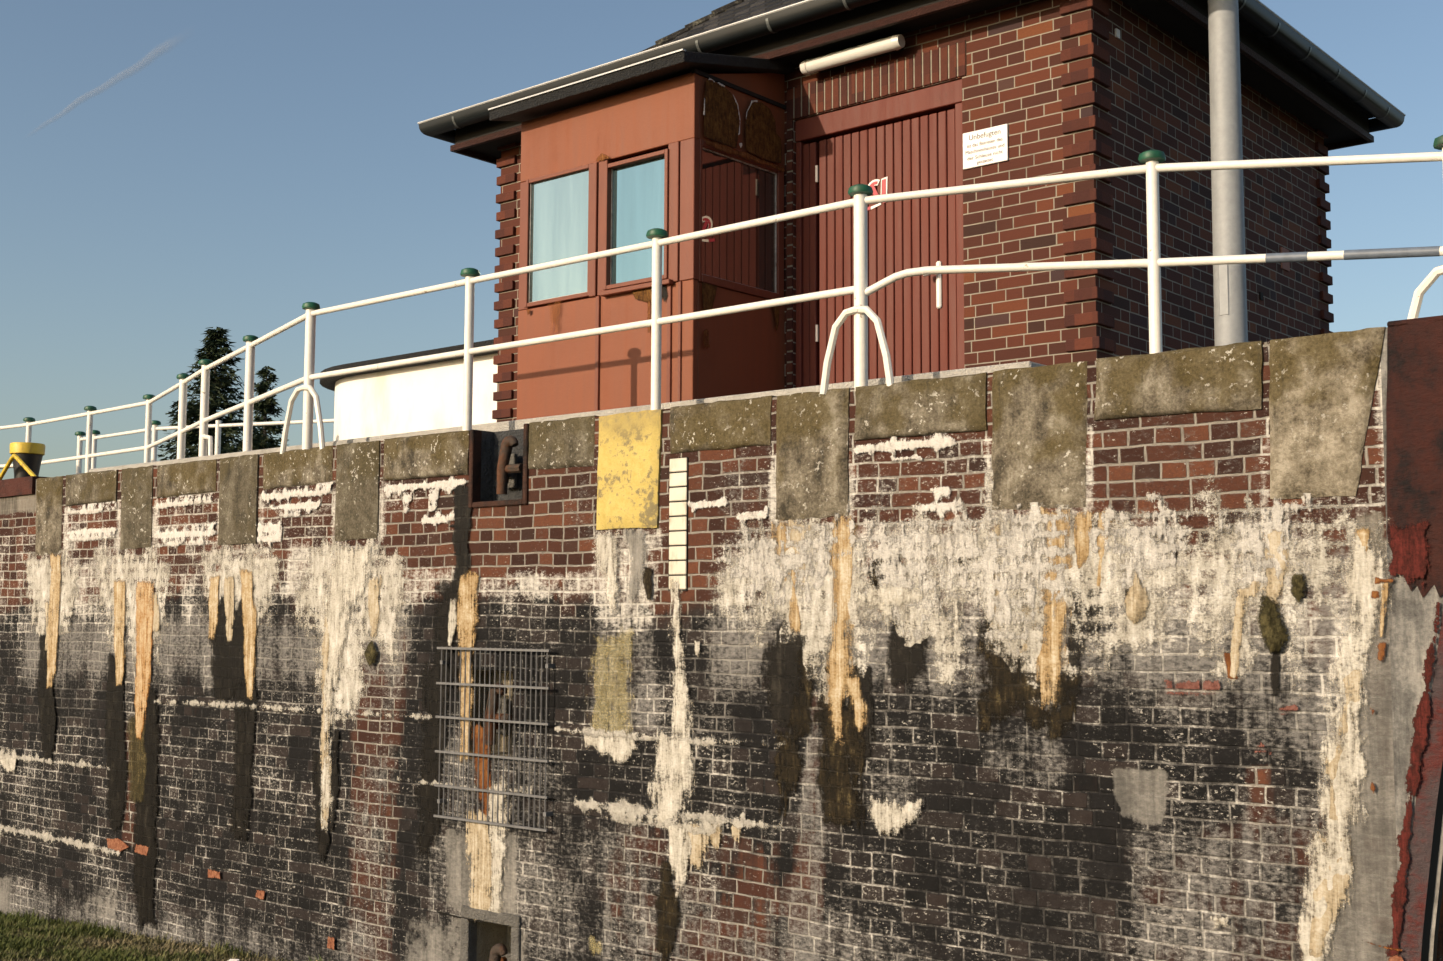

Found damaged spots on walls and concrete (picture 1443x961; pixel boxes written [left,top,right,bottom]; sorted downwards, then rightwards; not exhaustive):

leakage [0,758,16,773]
leakage [37,634,56,765]
leakage [105,651,160,931]
leakage [207,595,258,843]
leakage [312,540,382,862]
leakage [574,487,1197,961]
leakage [853,433,956,462]
leakage [1217,493,1322,587]
leakage [1297,528,1386,961]
rust [1371,577,1393,661]